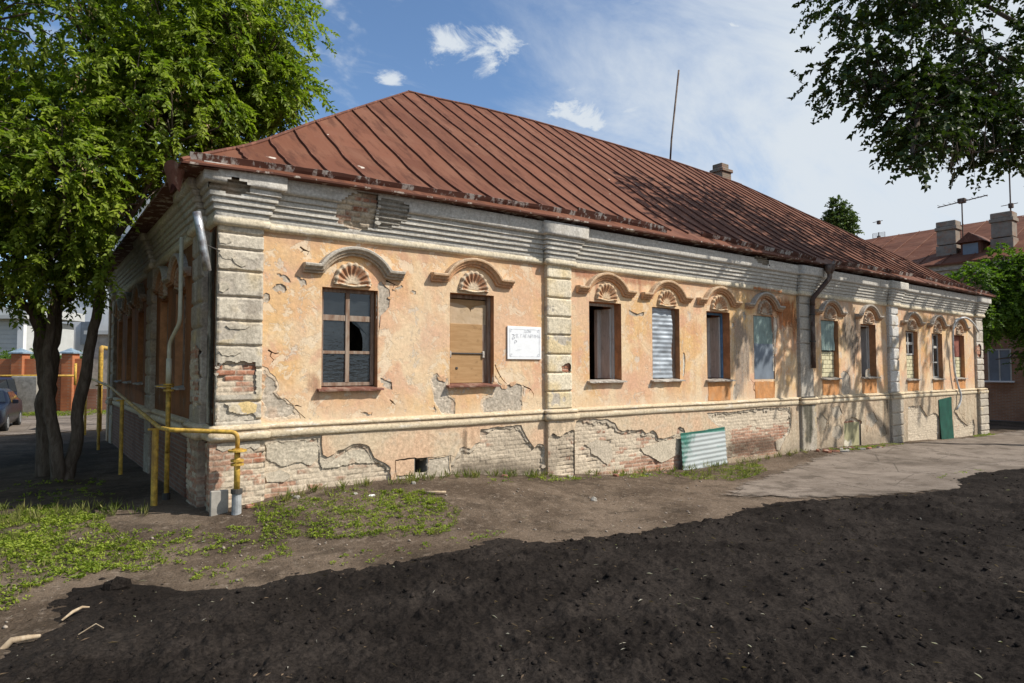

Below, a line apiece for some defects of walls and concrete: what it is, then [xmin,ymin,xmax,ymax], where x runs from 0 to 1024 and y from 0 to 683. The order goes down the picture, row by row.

flaking render [336,191,411,233]
flaking render [189,232,307,424]
flaking render [430,373,456,414]
flaking render [480,376,524,412]
flaking render [707,383,791,458]
flaking render [185,419,684,512]